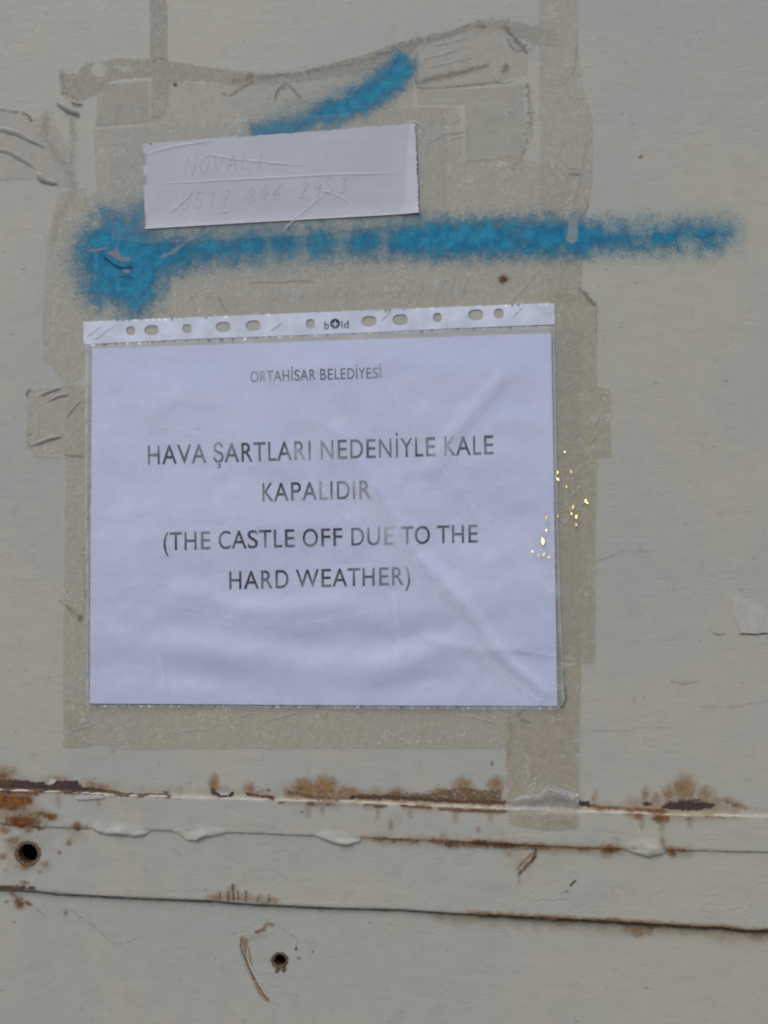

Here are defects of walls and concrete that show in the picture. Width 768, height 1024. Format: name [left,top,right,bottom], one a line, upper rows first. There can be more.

rust [246,778,507,813]
rust [578,780,709,829]
rust [0,791,57,908]
rust [374,823,619,874]
rust [242,923,273,999]